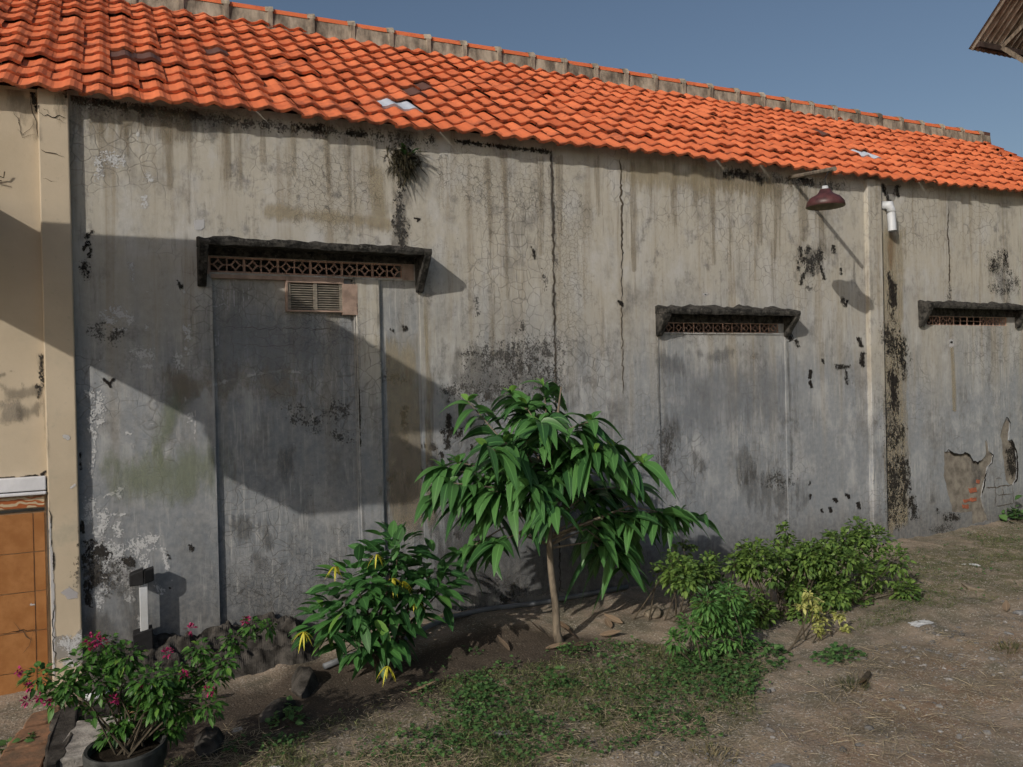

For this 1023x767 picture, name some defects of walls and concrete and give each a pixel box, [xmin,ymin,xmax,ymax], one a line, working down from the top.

water stain [391,178,410,247]
crack [617,160,625,389]
water stain [796,244,836,291]
water stain [281,388,361,447]
water stain [399,320,567,463]
water stain [880,271,920,531]
water stain [930,508,961,534]
spalling [943,417,1018,524]
spalling [46,500,85,677]